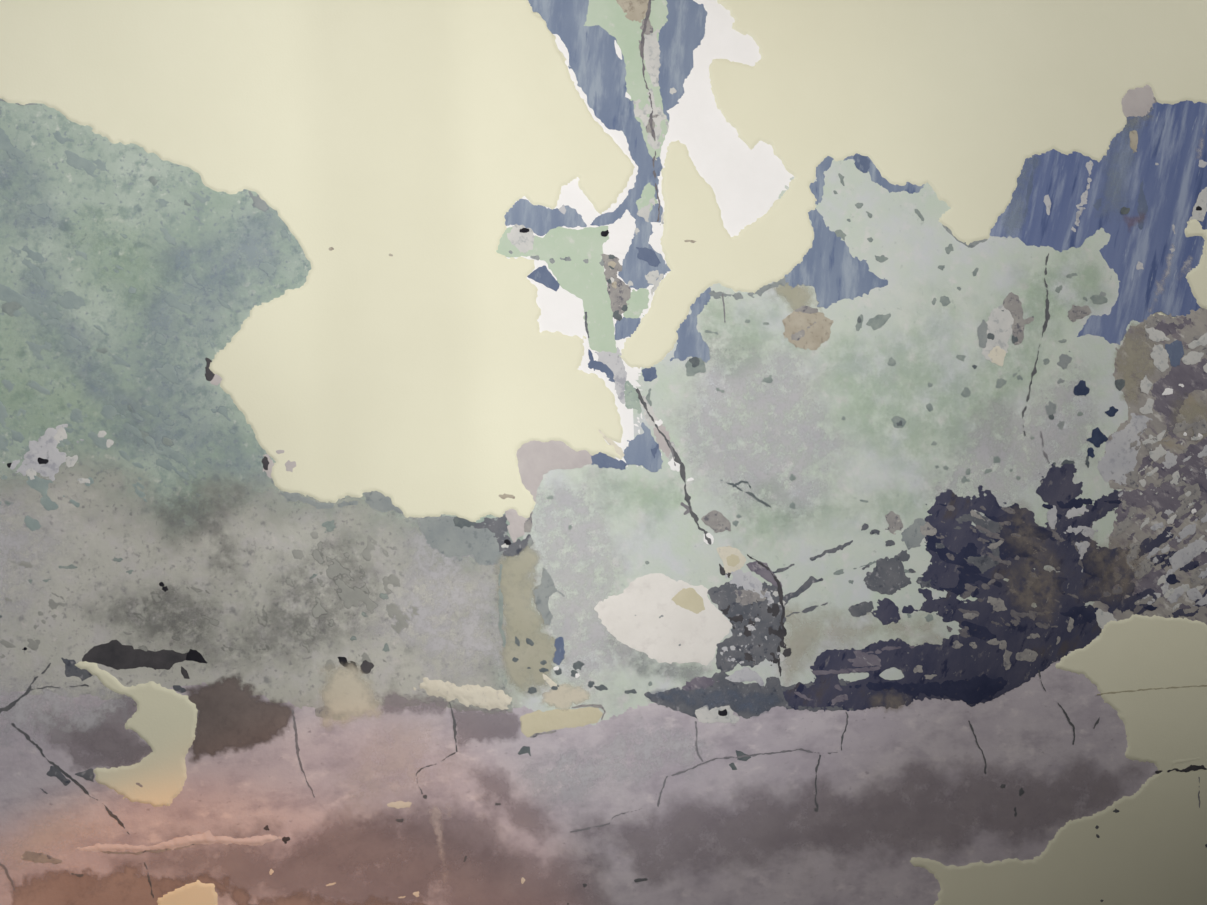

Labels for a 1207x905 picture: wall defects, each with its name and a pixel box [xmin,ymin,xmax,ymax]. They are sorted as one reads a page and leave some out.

peeling [496,0,795,501]
peeling [0,98,512,717]
crack [636,388,714,545]
peeling [523,84,1207,724]
crack [1022,253,1050,464]
crack [0,663,130,835]
leakage [323,666,378,724]
leakage [498,548,608,694]
flaking render [0,658,1158,905]
crack [570,712,849,832]
crack [0,863,16,892]